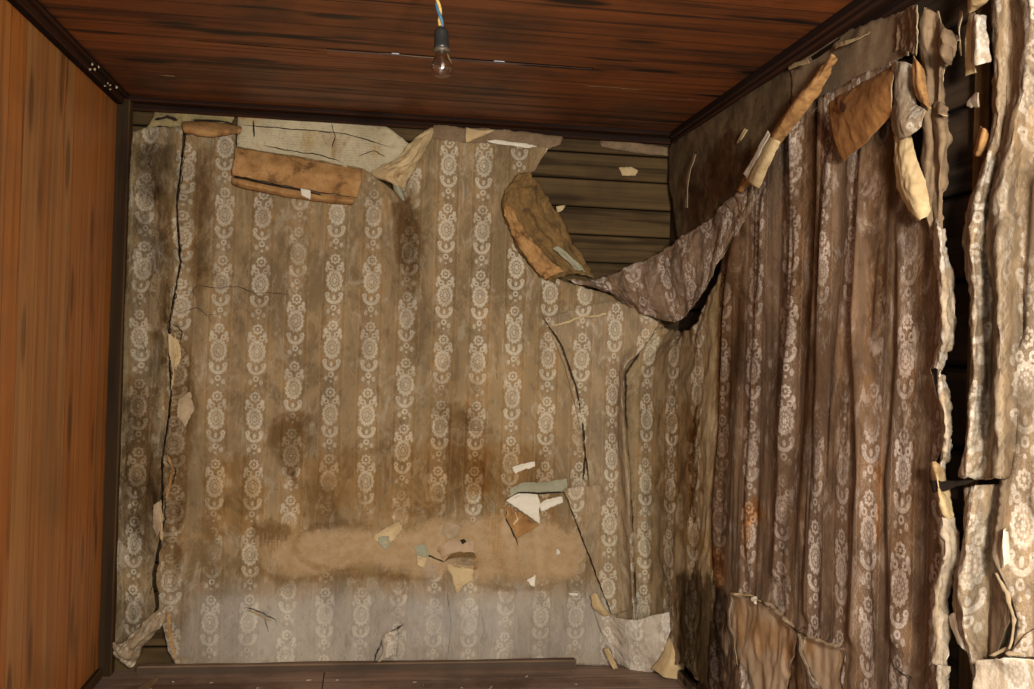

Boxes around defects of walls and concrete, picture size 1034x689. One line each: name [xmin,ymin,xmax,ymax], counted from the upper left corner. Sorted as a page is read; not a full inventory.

peeling [373,522,403,549]
damp [268,516,584,579]
peeling [414,540,478,594]
peeling [504,461,568,545]
damp [678,576,727,689]
peeling [730,592,844,689]